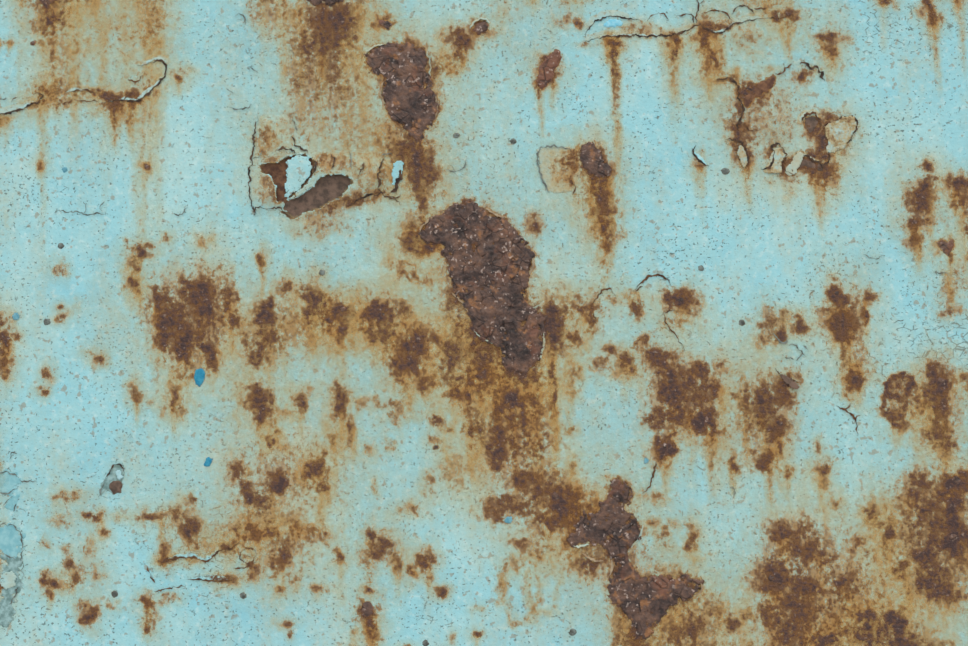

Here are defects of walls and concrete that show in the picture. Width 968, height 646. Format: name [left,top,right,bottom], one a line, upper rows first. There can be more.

crack [0,54,171,115]
peeling [248,112,405,239]
peeling [536,144,582,195]
crack [584,0,793,43]
corrosion [582,0,863,216]
peeling [716,62,824,168]
peeling [761,109,858,176]
corrosion [900,159,968,317]
corrosion [755,274,879,401]
corrosion [589,330,804,500]
corrosion [135,377,356,593]
corrosion [351,526,449,646]